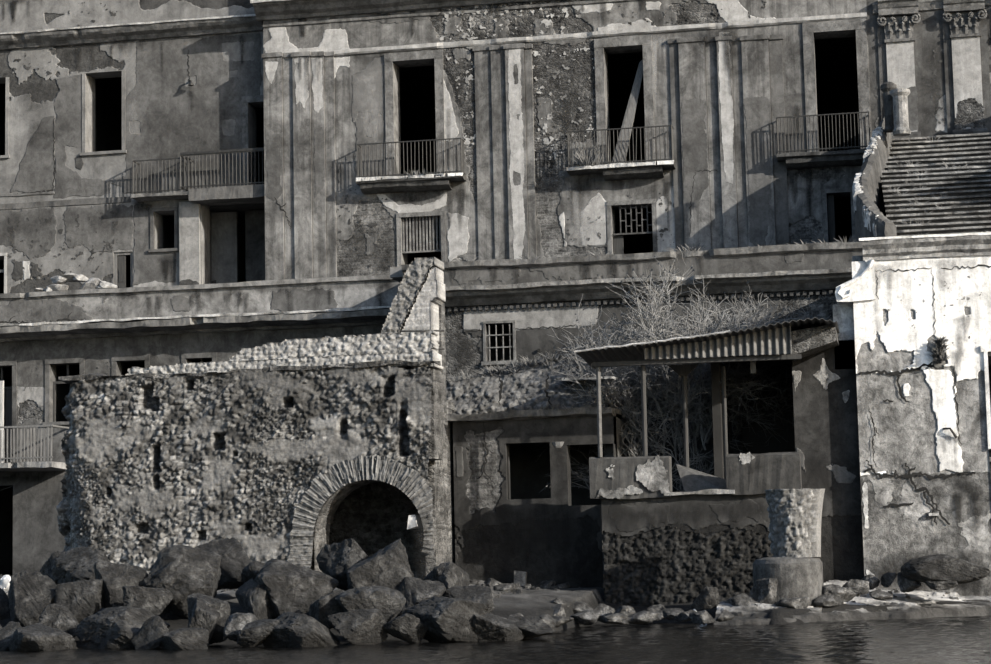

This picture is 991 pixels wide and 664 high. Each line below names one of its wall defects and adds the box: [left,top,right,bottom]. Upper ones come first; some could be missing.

peeling [0,0,776,324]
peeling [784,93,807,153]
spalling [907,86,919,131]
spalling [935,95,987,133]
crack [874,264,991,337]
peeling [792,358,840,391]
spalling [455,427,504,514]
spalling [816,309,991,596]
crack [858,363,976,525]
spalling [455,515,605,601]